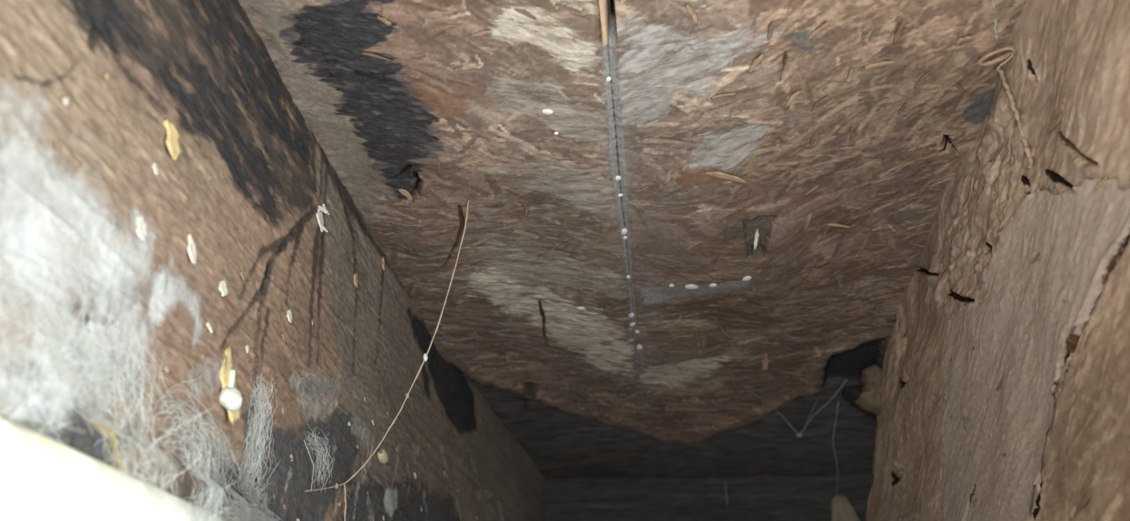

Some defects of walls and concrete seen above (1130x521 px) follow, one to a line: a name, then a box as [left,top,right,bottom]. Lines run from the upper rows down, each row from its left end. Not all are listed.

water stain [489,0,603,76]
water stain [492,16,818,144]
water stain [522,162,623,214]
water stain [687,124,775,174]
water stain [61,0,461,521]
water stain [465,238,753,389]
water stain [407,308,877,479]